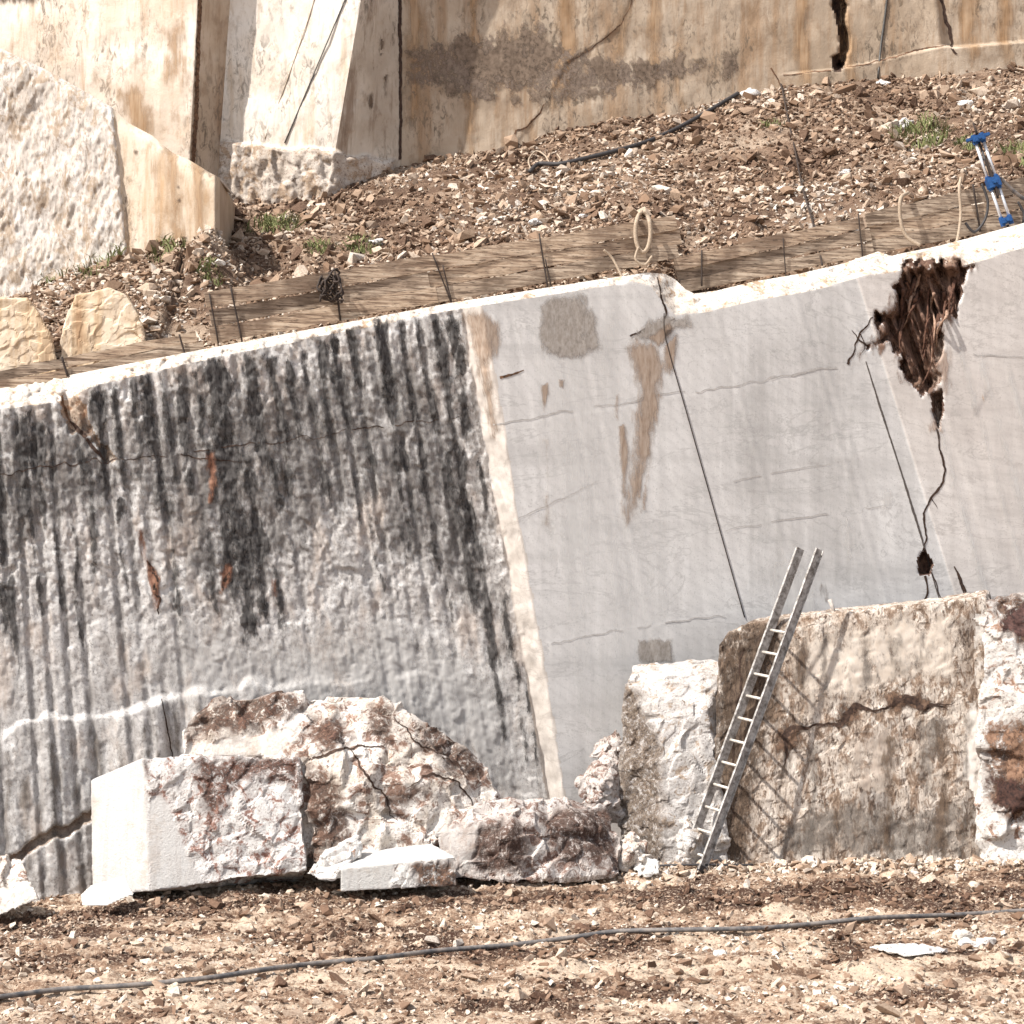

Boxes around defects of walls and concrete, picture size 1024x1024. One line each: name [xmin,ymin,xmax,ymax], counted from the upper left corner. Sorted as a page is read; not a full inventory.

crack [770,0,957,87]
leakage [539,295,598,359]
leakage [619,325,676,522]
spalling [859,256,975,431]
crack [922,427,1009,599]
crack [781,694,955,768]